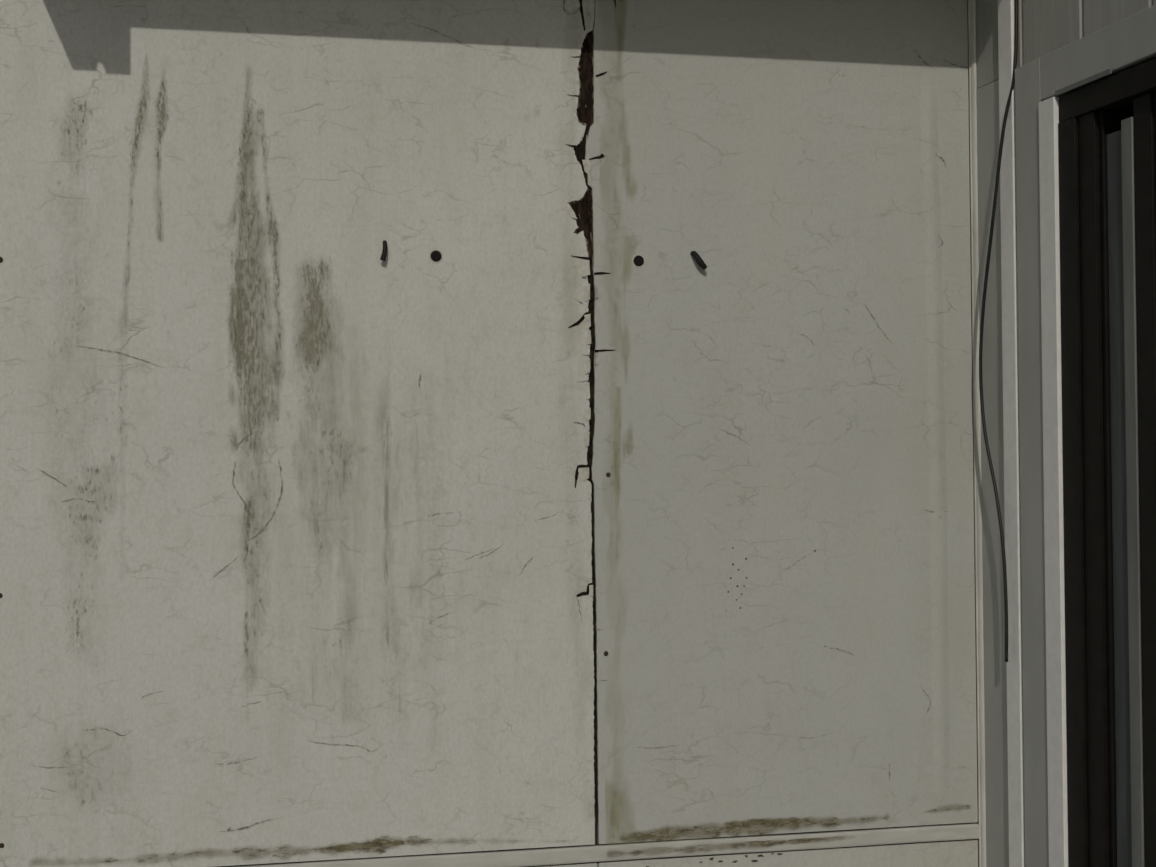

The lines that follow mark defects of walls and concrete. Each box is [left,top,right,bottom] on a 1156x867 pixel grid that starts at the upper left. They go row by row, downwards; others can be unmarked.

damp [132,81,166,168]
crack [566,136,605,185]
damp [229,95,281,449]
damp [299,262,332,382]
crack [568,256,614,824]
damp [320,841,404,852]